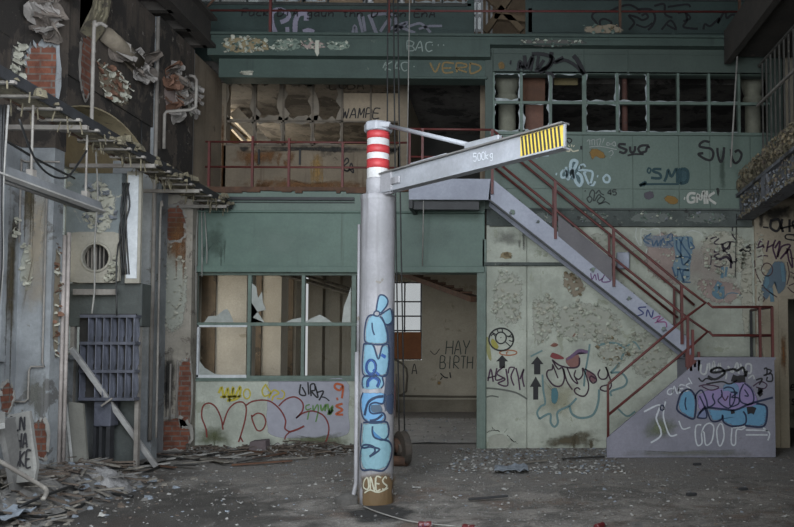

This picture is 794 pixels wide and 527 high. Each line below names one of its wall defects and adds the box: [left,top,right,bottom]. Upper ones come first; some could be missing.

flaking render [10,0,70,99]
peeling [78,35,205,125]
peeling [532,271,673,378]
flaking render [163,356,194,451]